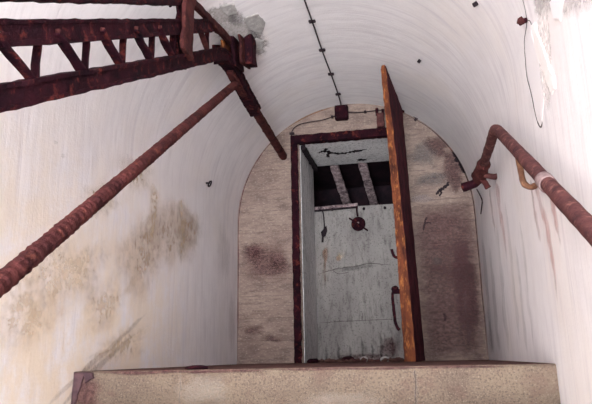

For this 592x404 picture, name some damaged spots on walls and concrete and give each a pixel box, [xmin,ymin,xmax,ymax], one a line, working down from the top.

spalling [209,3,266,54]
crack [317,148,367,161]
water stain [420,210,480,354]